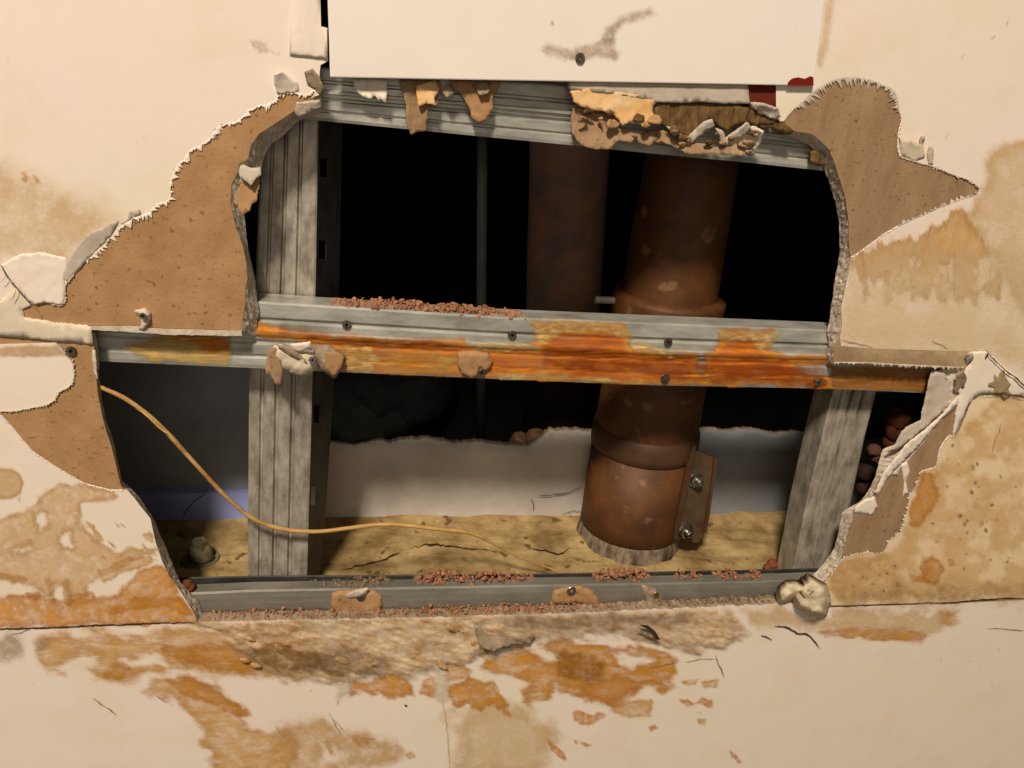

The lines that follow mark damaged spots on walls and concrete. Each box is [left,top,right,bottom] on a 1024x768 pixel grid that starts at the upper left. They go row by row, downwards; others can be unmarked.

peeling [273,68,324,97]
spalling [787,76,813,86]
water stain [845,141,1024,360]
peeling [1,252,68,305]
corrosion [128,335,230,366]
peeling [290,341,313,353]
corrosion [256,320,929,391]
water stain [0,469,23,498]
water stain [749,398,1024,641]
water stain [0,483,415,768]
crack [761,626,820,648]
water stain [350,638,717,768]